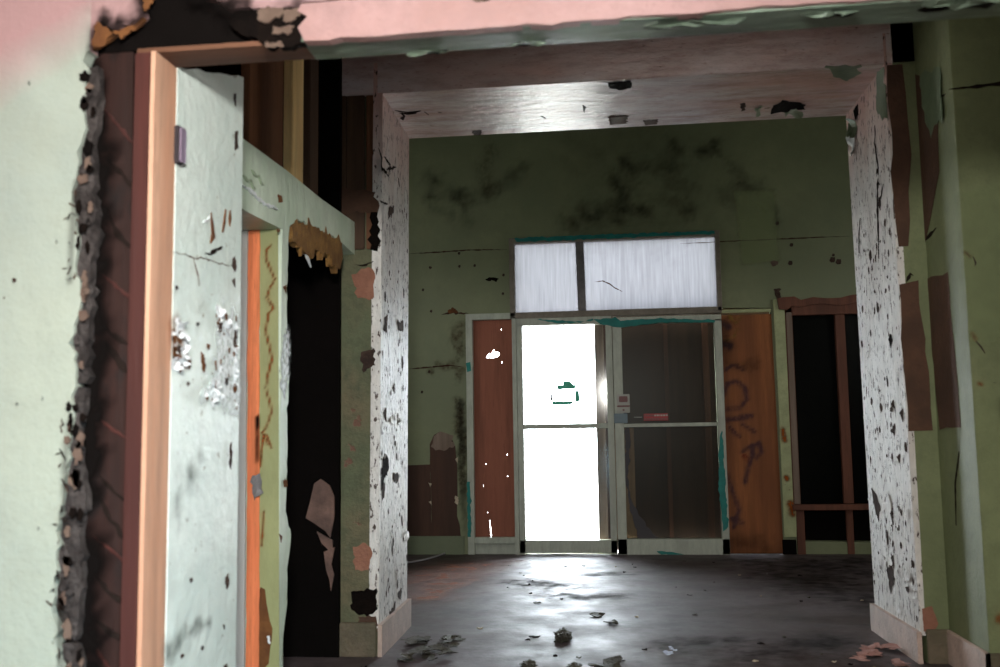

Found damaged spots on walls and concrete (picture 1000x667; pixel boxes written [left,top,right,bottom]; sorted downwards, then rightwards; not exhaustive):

flaking render [92,0,154,51]
flaking render [230,6,307,52]
peeling [917,0,1000,13]
peeling [845,104,859,156]
crack [171,251,229,286]
peeling [856,64,961,464]
flaking render [350,260,461,626]
peeling [868,488,918,599]
peeling [916,606,938,632]